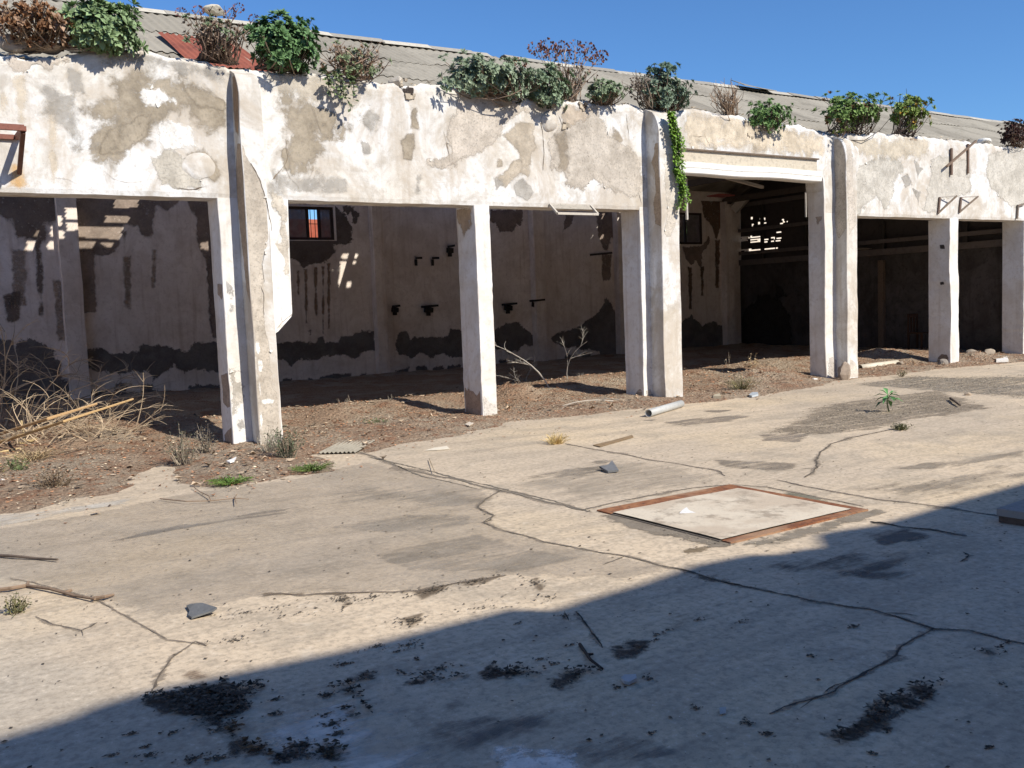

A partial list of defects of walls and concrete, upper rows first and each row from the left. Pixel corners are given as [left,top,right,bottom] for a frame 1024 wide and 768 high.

peeling [140,85,176,107]
peeling [426,90,530,169]
peeling [548,101,661,226]
water stain [267,73,375,381]
water stain [0,196,70,405]
water stain [76,198,243,414]
peeling [226,144,280,445]
water stain [395,329,463,372]
water stain [494,322,533,363]
crack [11,578,207,689]
crack [263,575,505,596]
crack [356,428,1024,714]